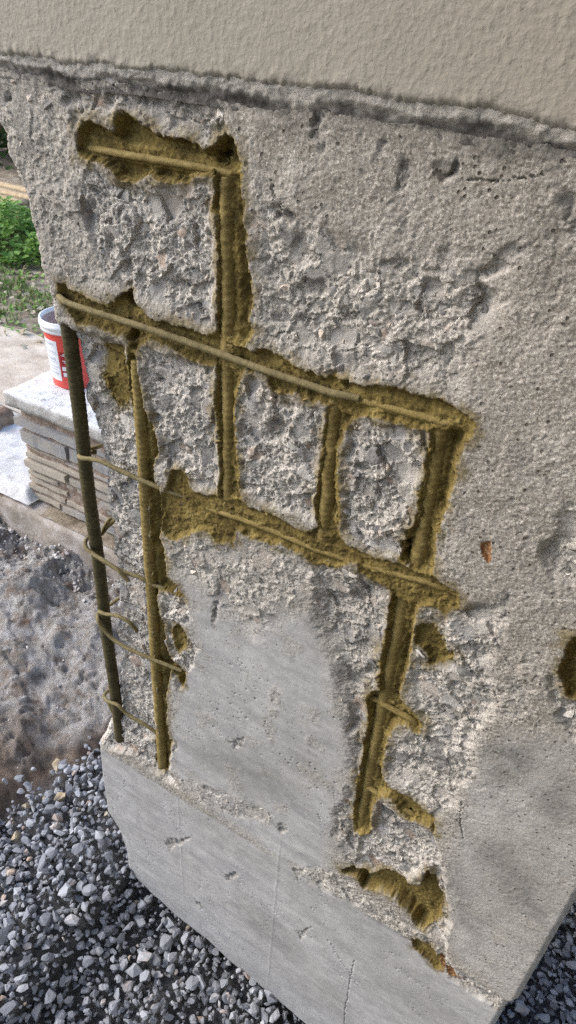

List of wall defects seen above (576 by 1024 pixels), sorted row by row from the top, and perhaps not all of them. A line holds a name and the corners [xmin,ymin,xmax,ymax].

spalling [0,74,232,331]
spalling [310,110,334,156]
spalling [395,151,416,195]
spalling [431,157,464,186]
spalling [244,173,511,402]
spalling [76,331,288,835]
spalling [235,375,328,522]
spalling [337,417,430,560]
corrosion [480,541,492,564]
spalling [548,637,576,741]
spalling [162,537,513,1013]